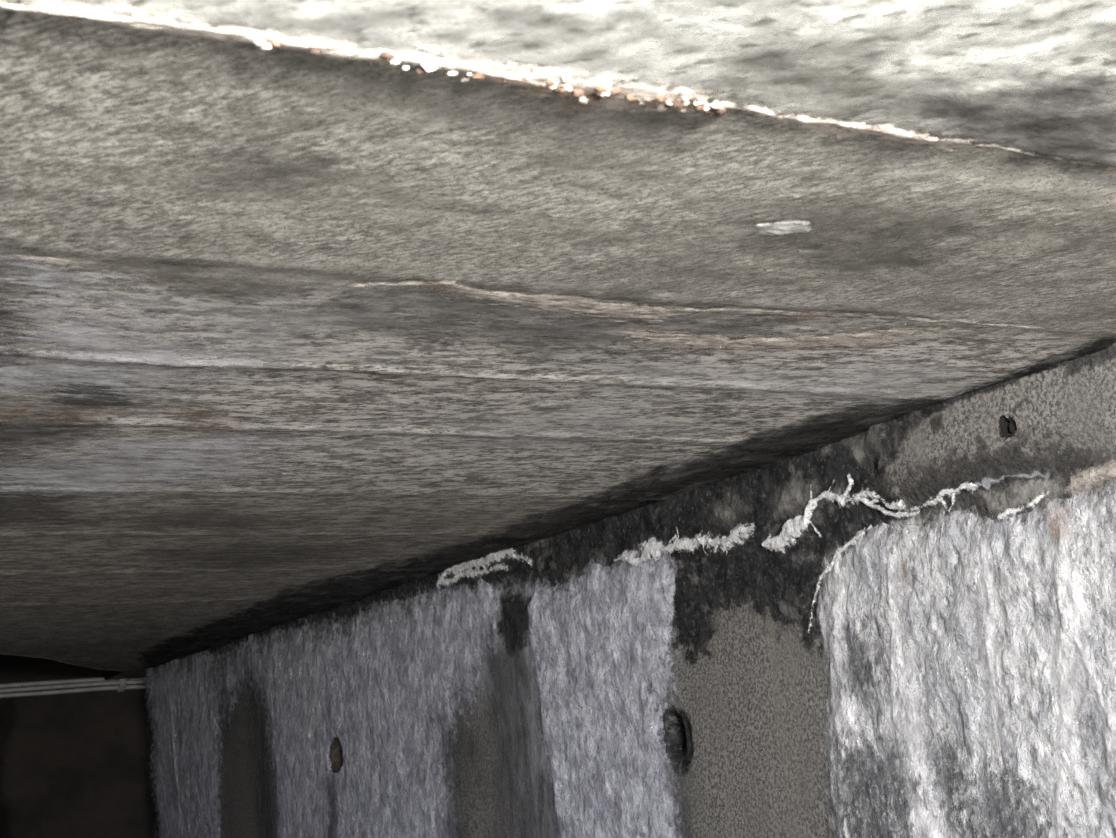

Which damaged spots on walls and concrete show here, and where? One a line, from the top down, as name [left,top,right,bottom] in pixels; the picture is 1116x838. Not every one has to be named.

water stain [0,257,304,531]
water stain [134,397,1116,838]